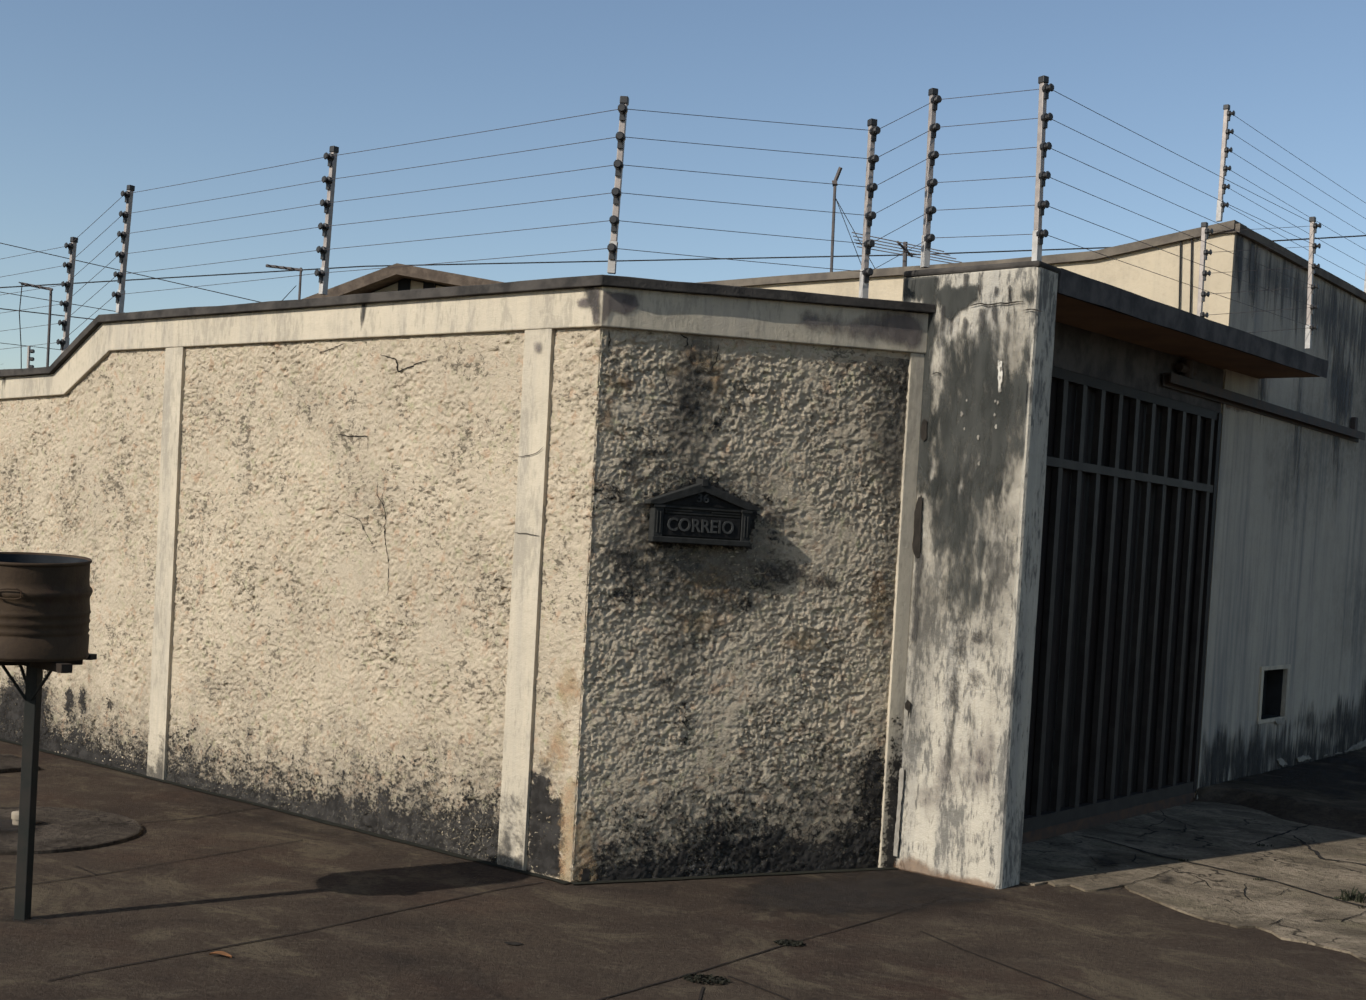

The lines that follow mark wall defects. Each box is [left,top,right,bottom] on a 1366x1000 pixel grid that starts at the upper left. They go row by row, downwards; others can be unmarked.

water stain [578,287,638,324]
water stain [1235,235,1366,491]
water stain [678,397,725,438]
crack [348,483,389,596]
water stain [592,477,627,510]
water stain [603,544,654,606]
water stain [739,562,837,613]
water stain [911,468,1001,641]
water stain [0,670,885,882]
water stain [944,680,955,768]
water stain [1199,686,1366,788]
crack [1084,810,1366,925]